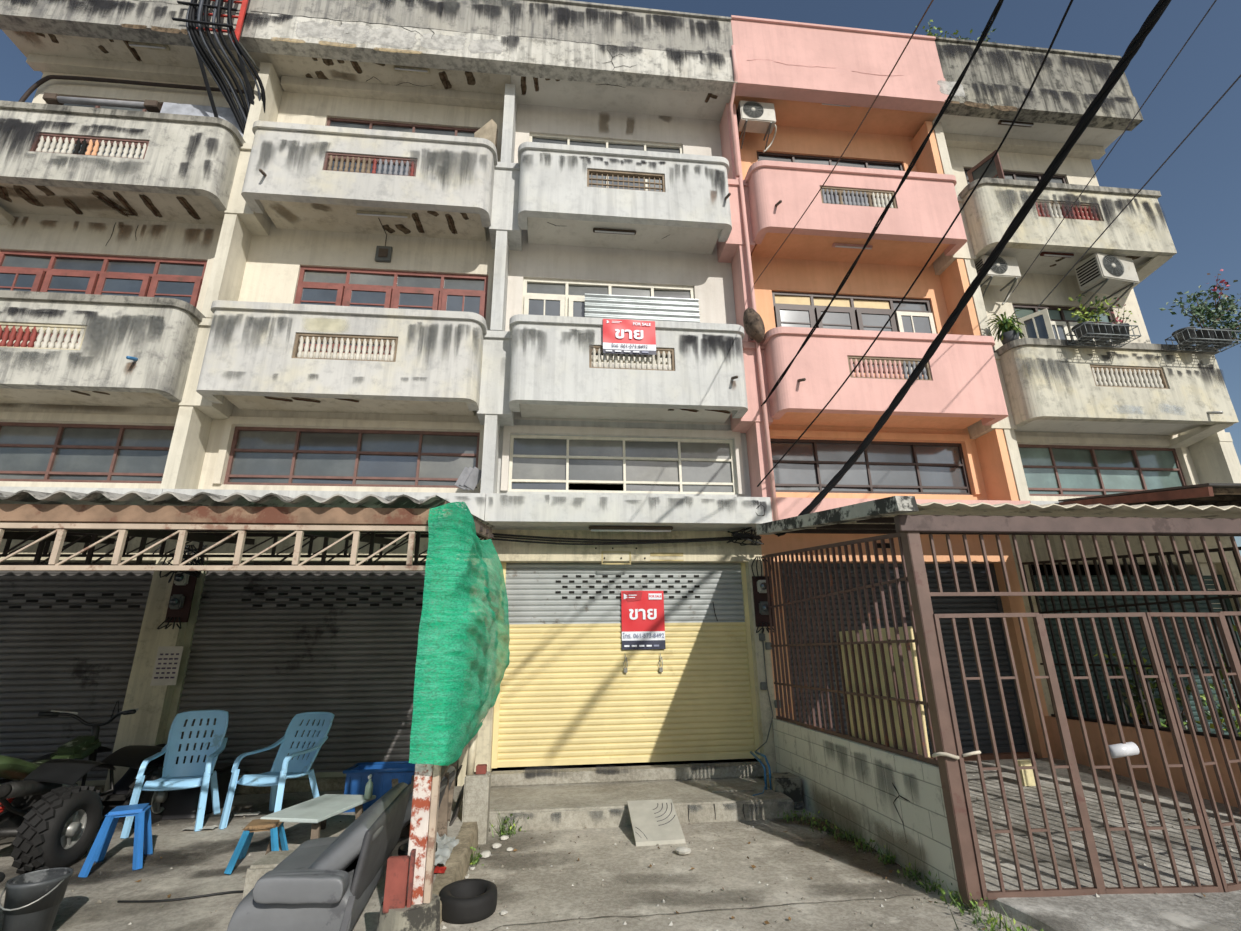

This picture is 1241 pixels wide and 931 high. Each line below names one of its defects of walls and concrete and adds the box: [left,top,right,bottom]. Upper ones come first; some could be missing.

damp [13,0,198,17]
damp [244,13,291,25]
damp [939,44,1112,78]
damp [972,83,1128,107]
damp [0,118,143,151]
damp [180,133,218,173]
damp [580,156,665,167]
damp [715,170,725,193]
damp [1060,194,1164,223]
damp [0,307,97,317]
damp [680,334,741,356]
damp [1198,361,1224,382]